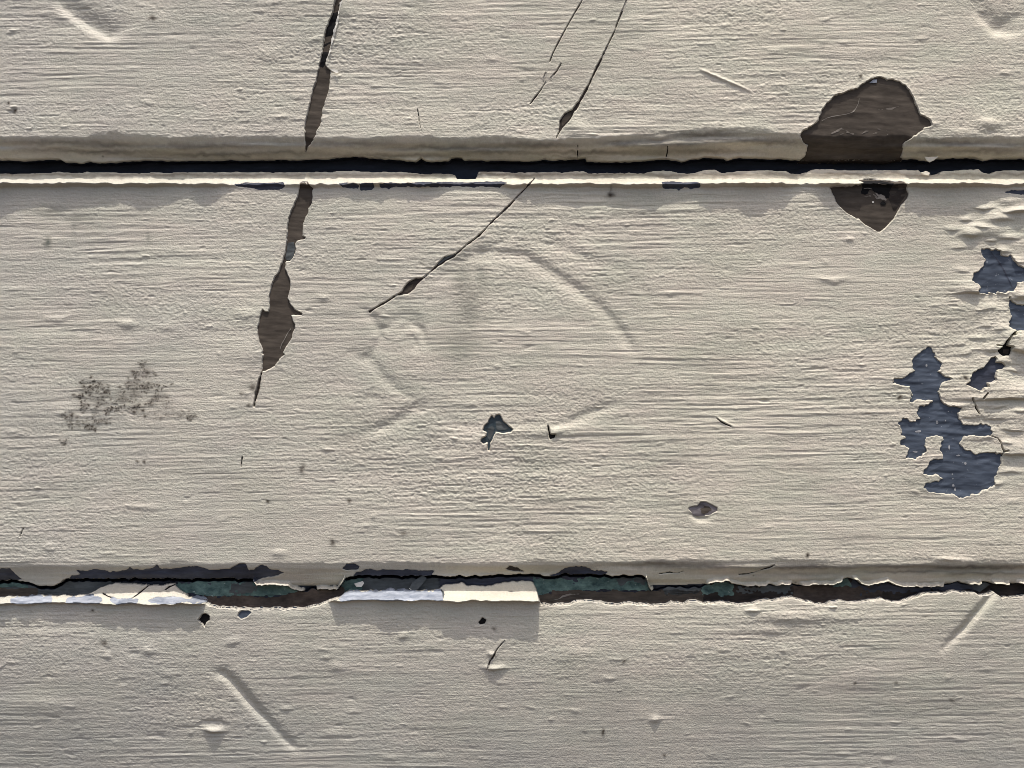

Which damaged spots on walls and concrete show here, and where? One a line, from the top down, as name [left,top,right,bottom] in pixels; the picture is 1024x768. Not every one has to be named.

crack [530,0,583,104]
crack [556,0,627,157]
peeling [797,77,932,165]
crack [368,178,535,313]
peeling [830,179,908,232]
peeling [893,249,1024,498]
peeling [481,415,513,450]
peeling [688,502,717,516]
peeling [0,563,1024,626]